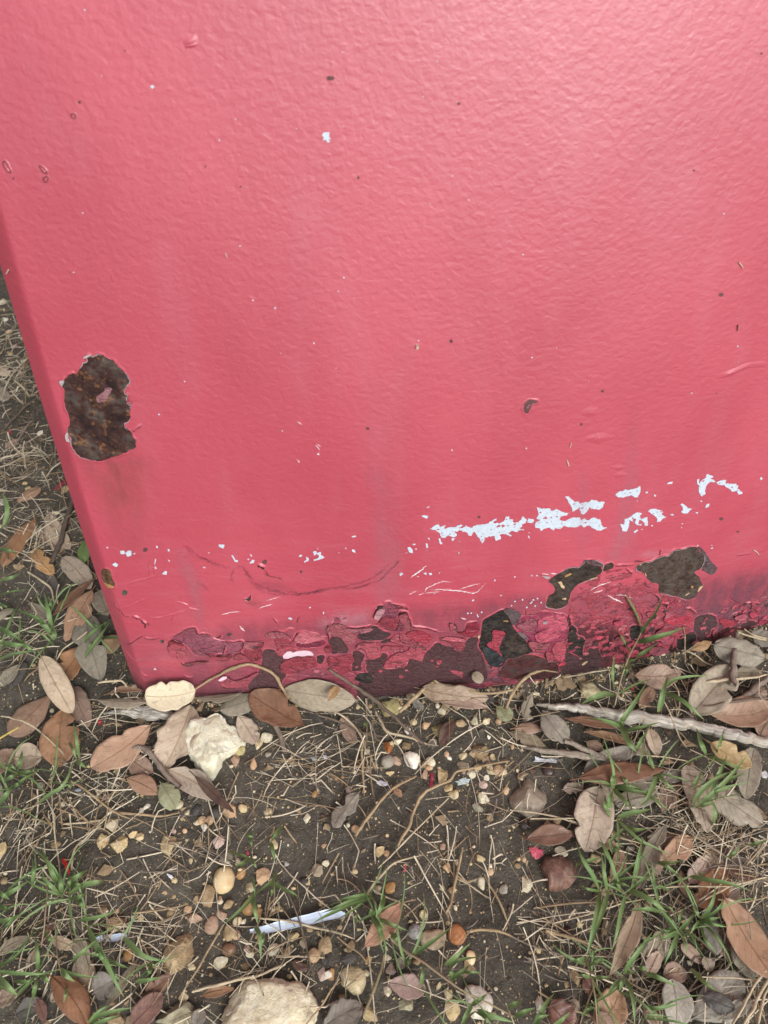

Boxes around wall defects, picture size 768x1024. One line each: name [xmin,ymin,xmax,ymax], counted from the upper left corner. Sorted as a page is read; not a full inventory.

rust [59,351,139,464]
peeling [407,496,607,553]
peeling [616,474,743,533]
peeling [160,569,768,698]